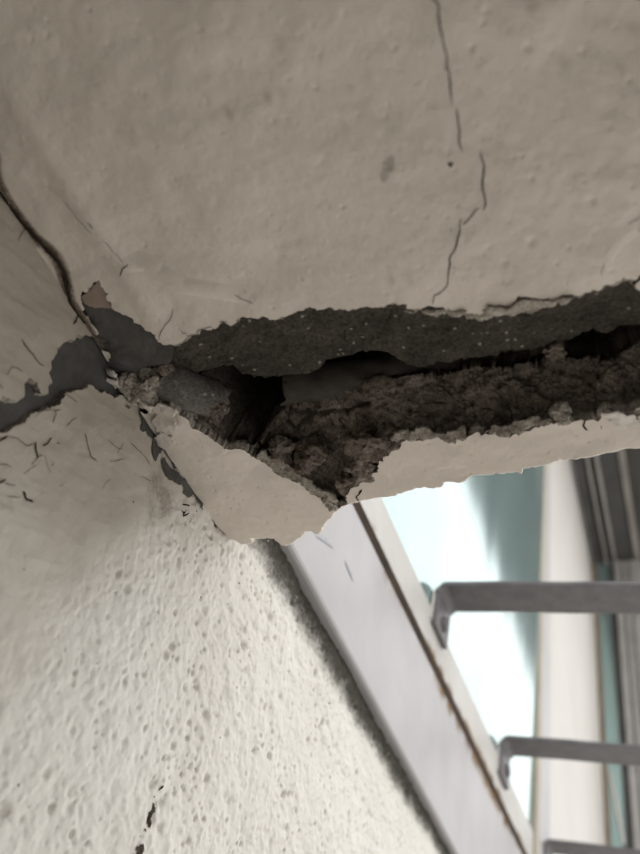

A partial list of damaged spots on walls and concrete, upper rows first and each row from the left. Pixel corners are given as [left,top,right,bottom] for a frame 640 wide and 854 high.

crack [432,0,486,305]
crack [0,191,86,324]
crack [63,200,128,277]
crack [0,340,44,389]
crack [0,395,151,502]
spalling [0,278,640,512]